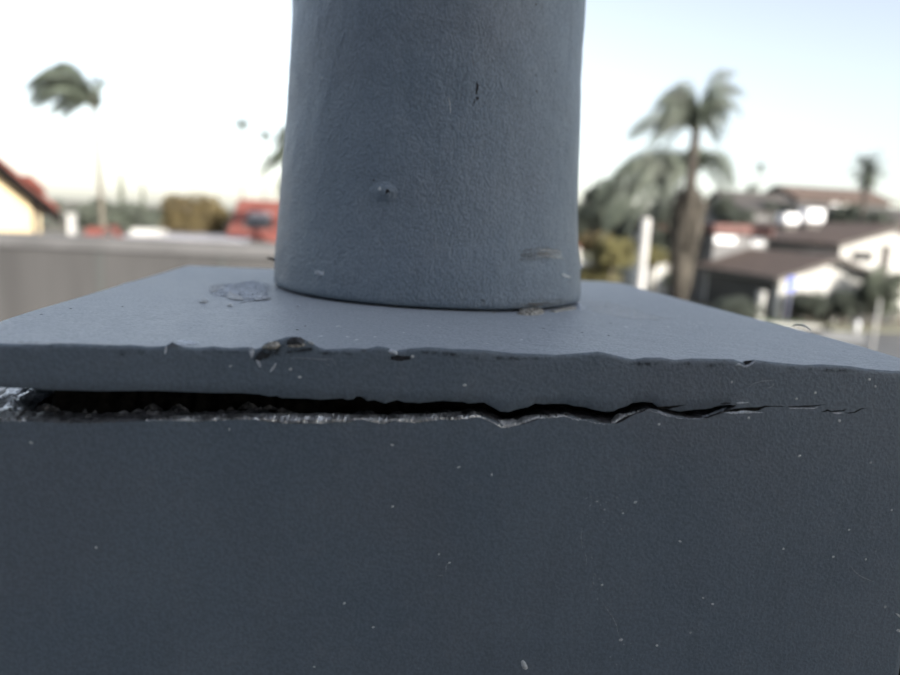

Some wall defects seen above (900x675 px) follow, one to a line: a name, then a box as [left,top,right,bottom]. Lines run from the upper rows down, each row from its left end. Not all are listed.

peeling [249,335,322,372]
crack [0,388,865,428]